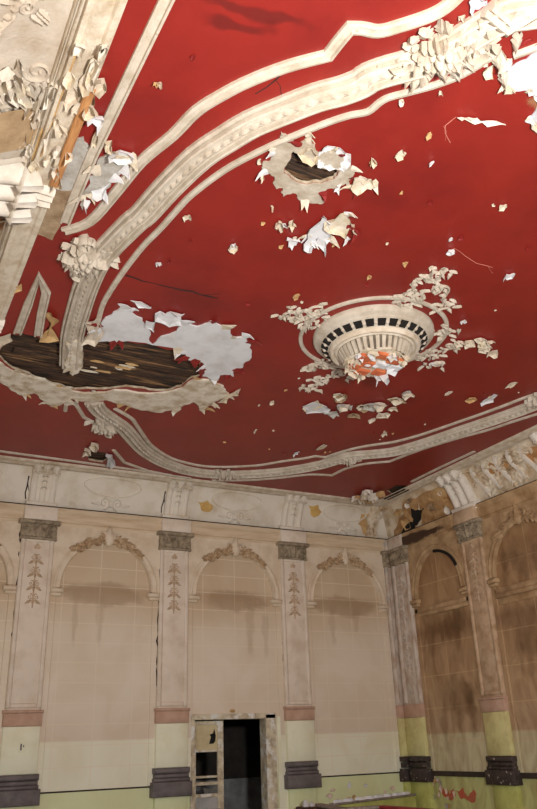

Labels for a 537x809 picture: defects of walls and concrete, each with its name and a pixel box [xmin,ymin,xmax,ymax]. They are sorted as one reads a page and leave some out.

peeling [458,0,487,23]
peeling [483,38,537,133]
spalling [0,43,138,240]
spalling [255,132,378,212]
peeling [271,205,362,257]
spalling [0,300,262,416]
spalling [343,347,410,386]
spalling [302,391,415,440]
peeling [465,393,497,406]
spalling [351,485,455,538]